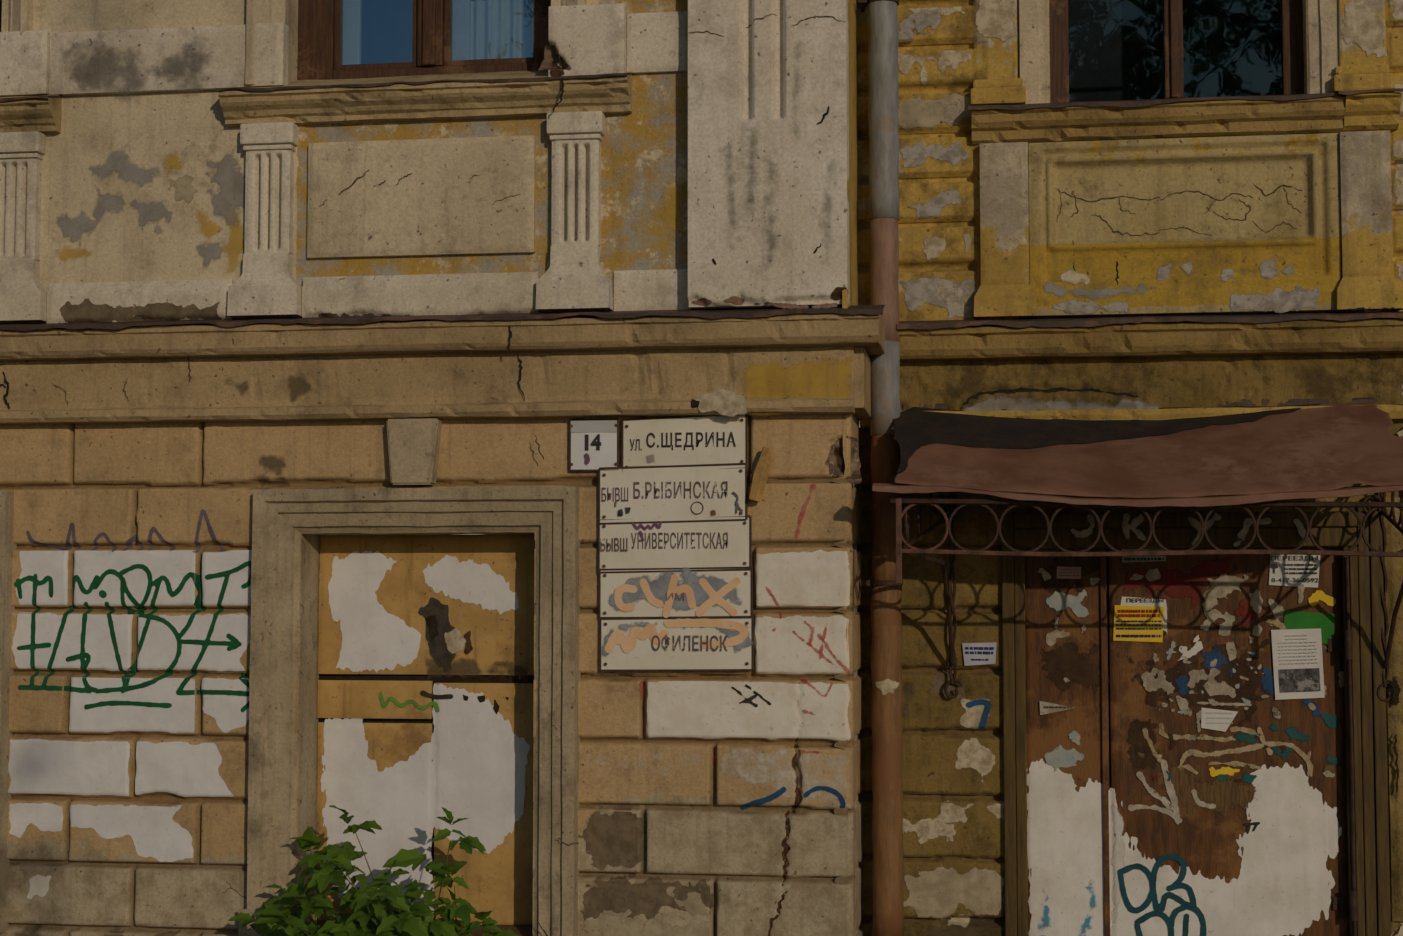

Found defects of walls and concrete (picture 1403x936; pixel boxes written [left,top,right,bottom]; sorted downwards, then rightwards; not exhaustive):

peeling [898,0,1018,168]
peeling [58,151,245,271]
peeling [911,189,963,219]
crack [1055,184,1303,285]
peeling [900,233,978,319]
peeling [1044,261,1193,314]
peeling [1221,256,1320,313]
peeling [418,597,473,672]
peeling [463,695,509,714]
crack [768,723,804,936]
peeling [903,800,1004,844]
peeling [904,867,1004,928]